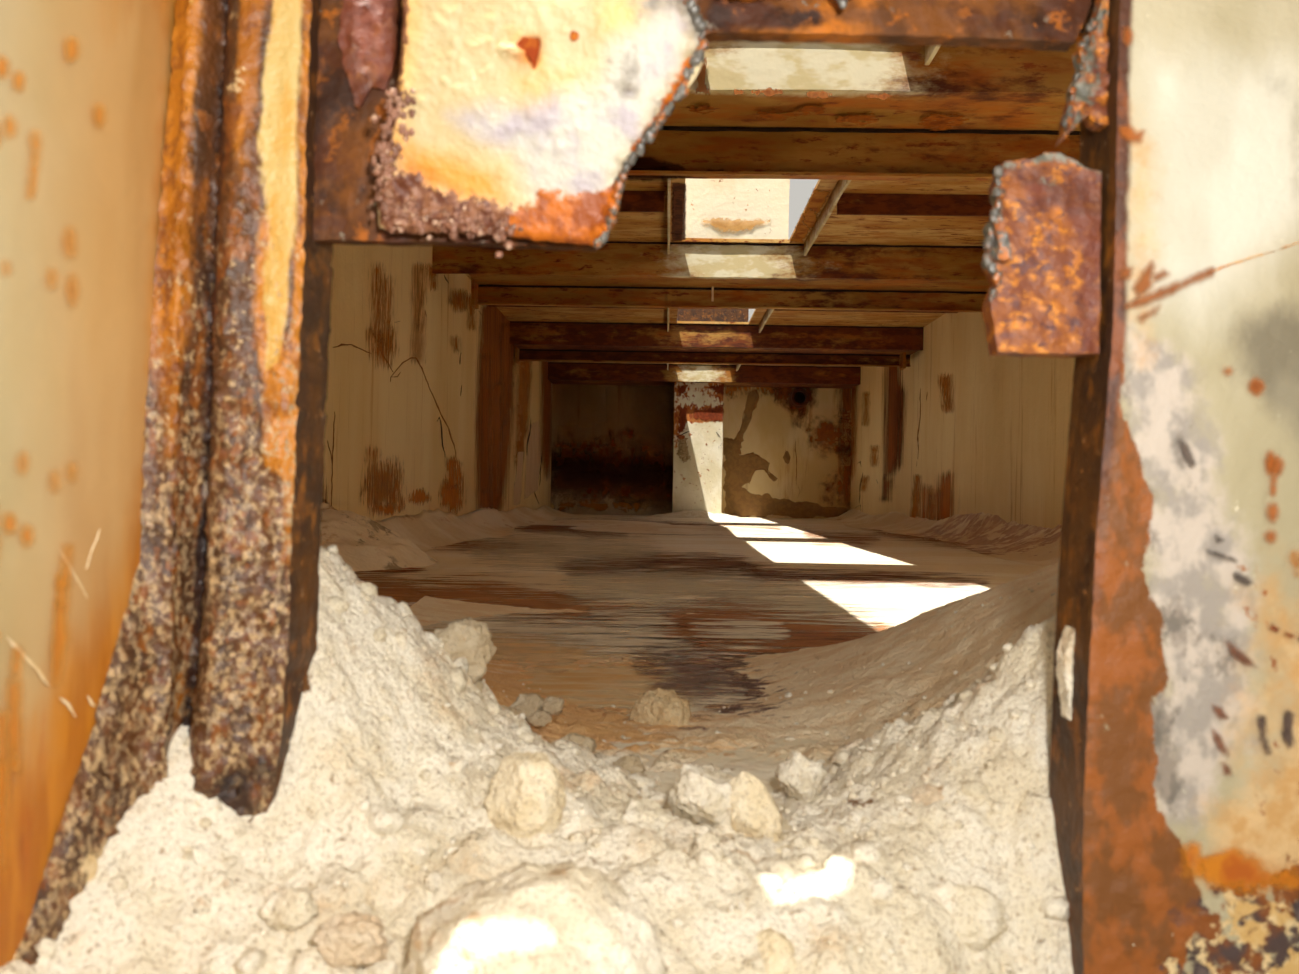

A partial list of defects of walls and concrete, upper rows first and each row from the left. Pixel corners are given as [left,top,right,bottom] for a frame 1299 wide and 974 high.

corrosion [734,87,891,126]
corrosion [363,87,523,258]
corrosion [626,157,690,242]
corrosion [703,218,770,232]
corrosion [790,189,829,243]
corrosion [366,266,396,369]
peeling [723,390,847,518]
spalling [1180,441,1195,466]
spalling [1208,535,1252,585]
spalling [1228,642,1253,665]
spalling [1213,706,1231,774]
spalling [1257,710,1294,754]